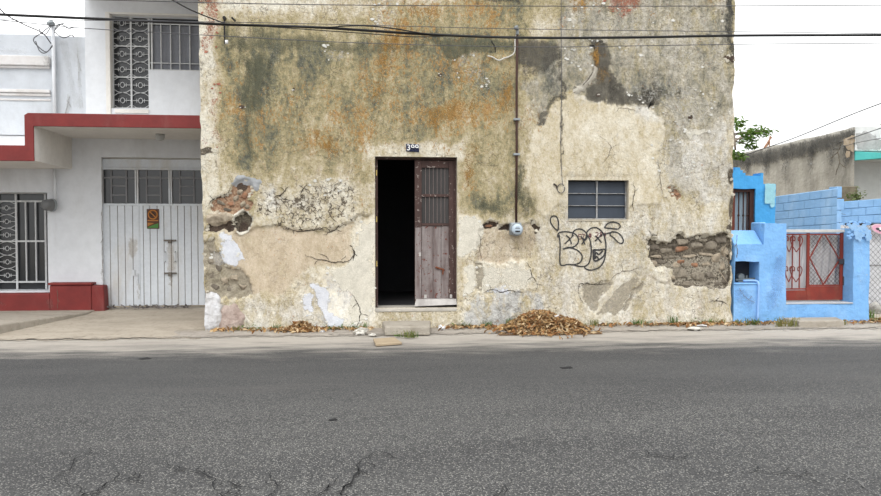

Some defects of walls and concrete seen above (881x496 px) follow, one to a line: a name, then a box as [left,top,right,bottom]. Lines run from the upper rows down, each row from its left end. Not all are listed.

water stain [228,33,363,119]
water stain [416,37,566,125]
water stain [586,40,668,106]
water stain [722,0,735,62]
peeling [202,177,376,327]
crack [285,224,357,263]
spalling [646,169,735,290]